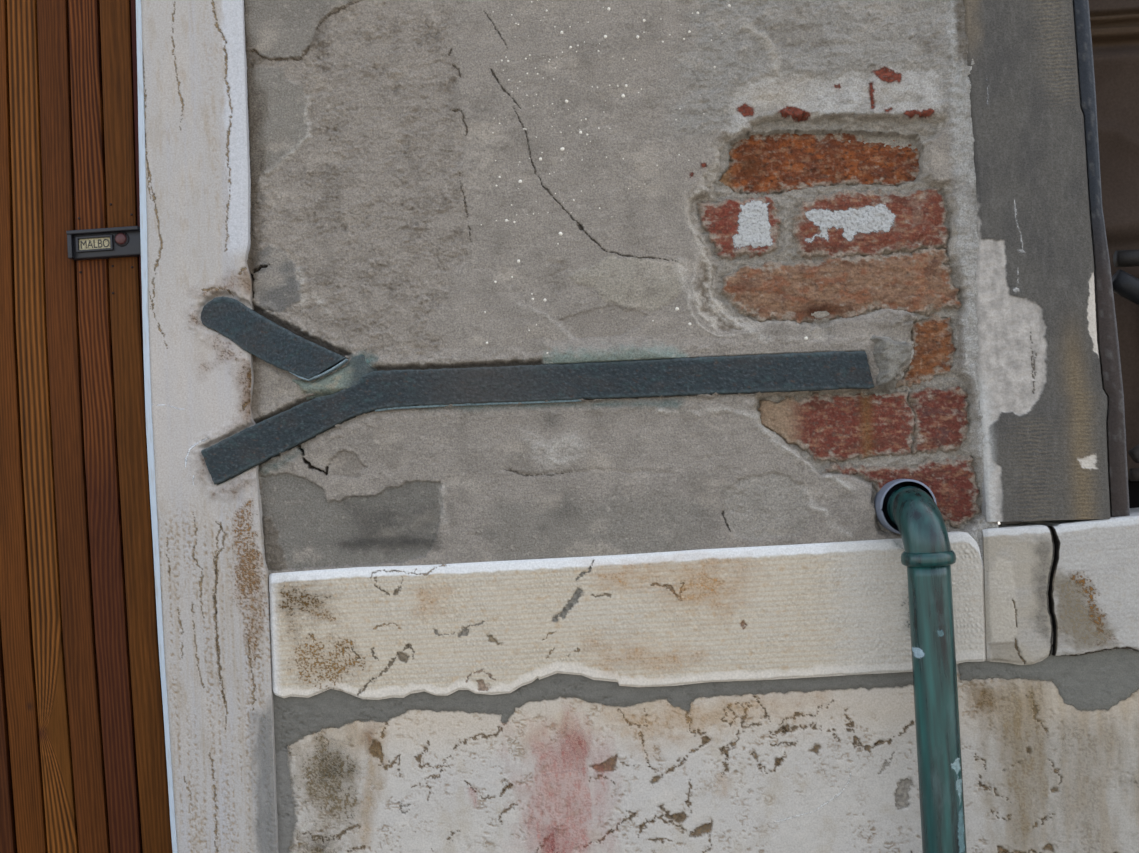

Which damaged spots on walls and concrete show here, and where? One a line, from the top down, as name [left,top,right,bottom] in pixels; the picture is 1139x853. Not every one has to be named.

crack [172,4,184,120]
crack [143,67,168,349]
spalling [244,0,472,360]
crack [491,69,673,261]
spalling [684,64,1048,538]
crack [166,512,257,729]
damp [235,549,265,656]
crack [1012,600,1025,664]
crack [303,824,365,852]
crack [369,723,518,822]
crack [583,696,914,853]
crack [974,697,1062,853]